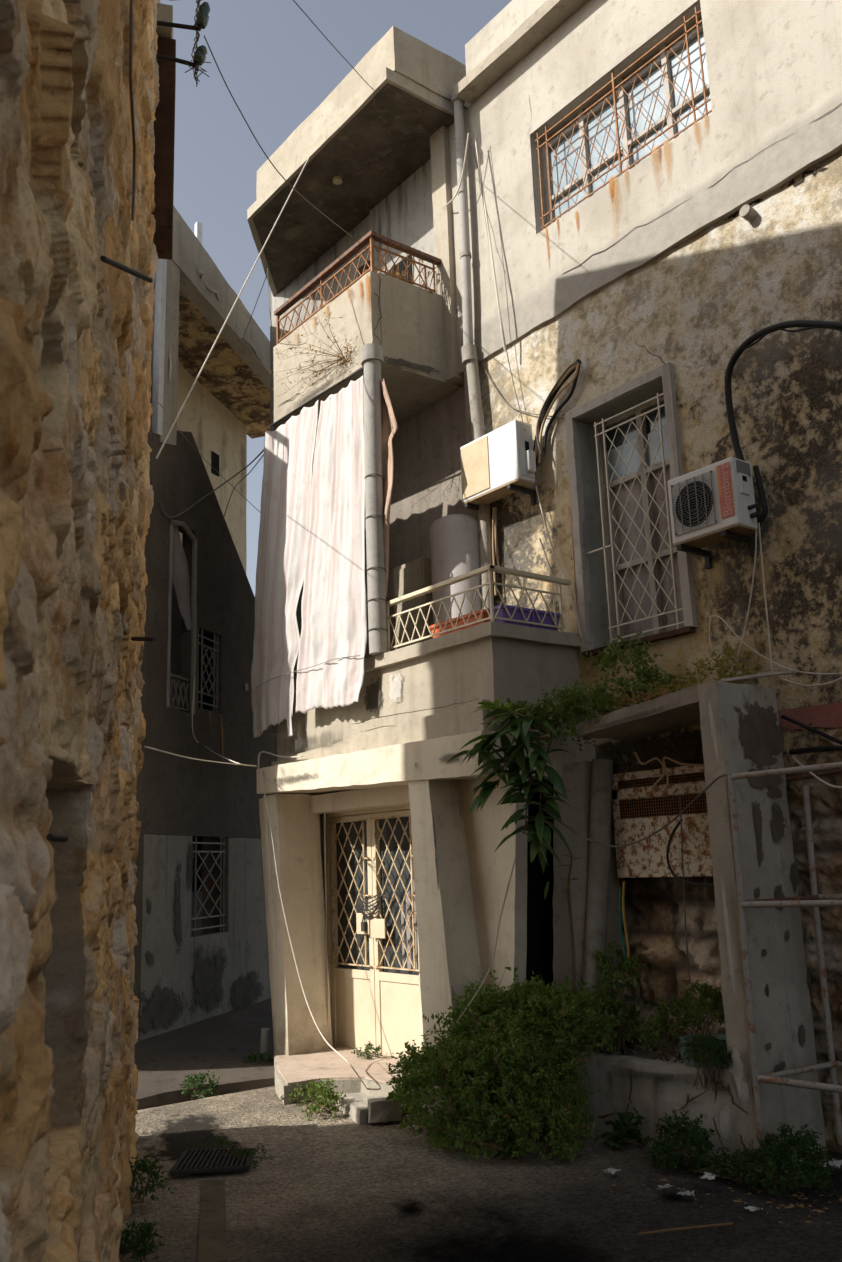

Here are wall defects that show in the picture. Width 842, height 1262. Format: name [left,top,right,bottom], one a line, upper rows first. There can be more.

corrosion [609,171,628,203]
corrosion [652,141,670,165]
crack [561,103,842,275]
peeling [735,697,787,866]
water stain [138,941,264,1034]